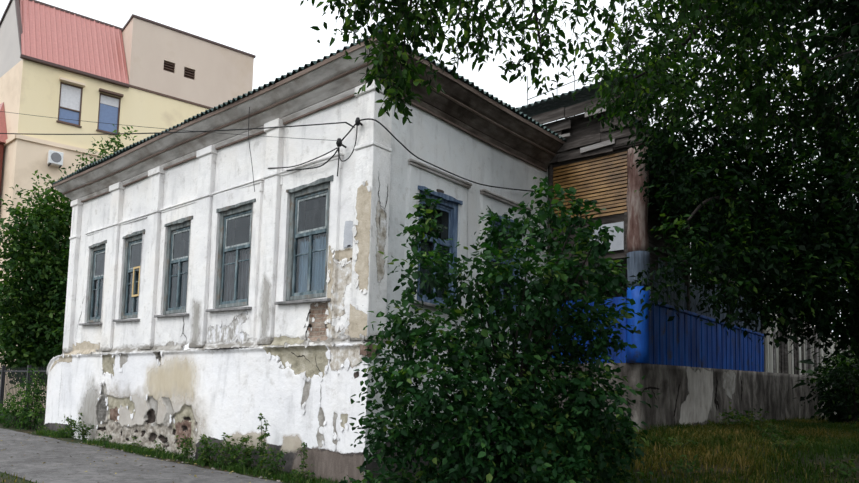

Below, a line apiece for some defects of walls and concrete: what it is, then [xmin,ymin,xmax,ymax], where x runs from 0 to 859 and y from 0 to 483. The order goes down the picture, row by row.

flaking render [262,181,387,415]
spalling [50,341,198,457]
damp [79,358,201,445]
flaking render [316,403,348,452]